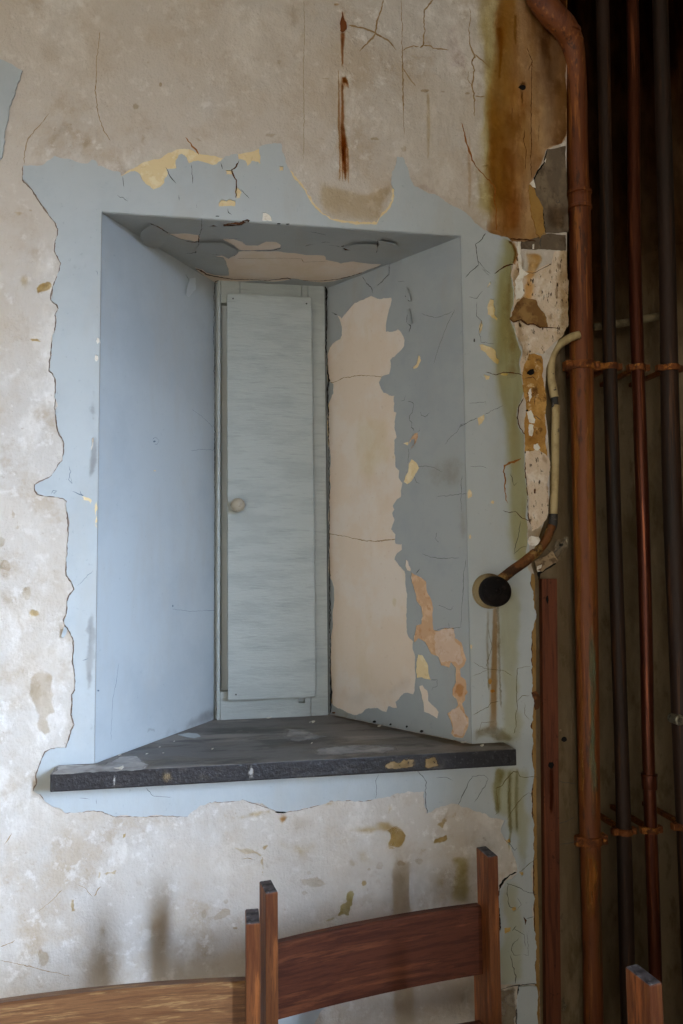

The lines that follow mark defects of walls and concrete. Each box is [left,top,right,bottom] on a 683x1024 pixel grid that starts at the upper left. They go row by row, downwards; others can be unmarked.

peeling [0,59,23,160]
crack [349,0,513,362]
peeling [23,143,569,1024]
crack [403,372,529,554]
crack [419,771,537,1024]